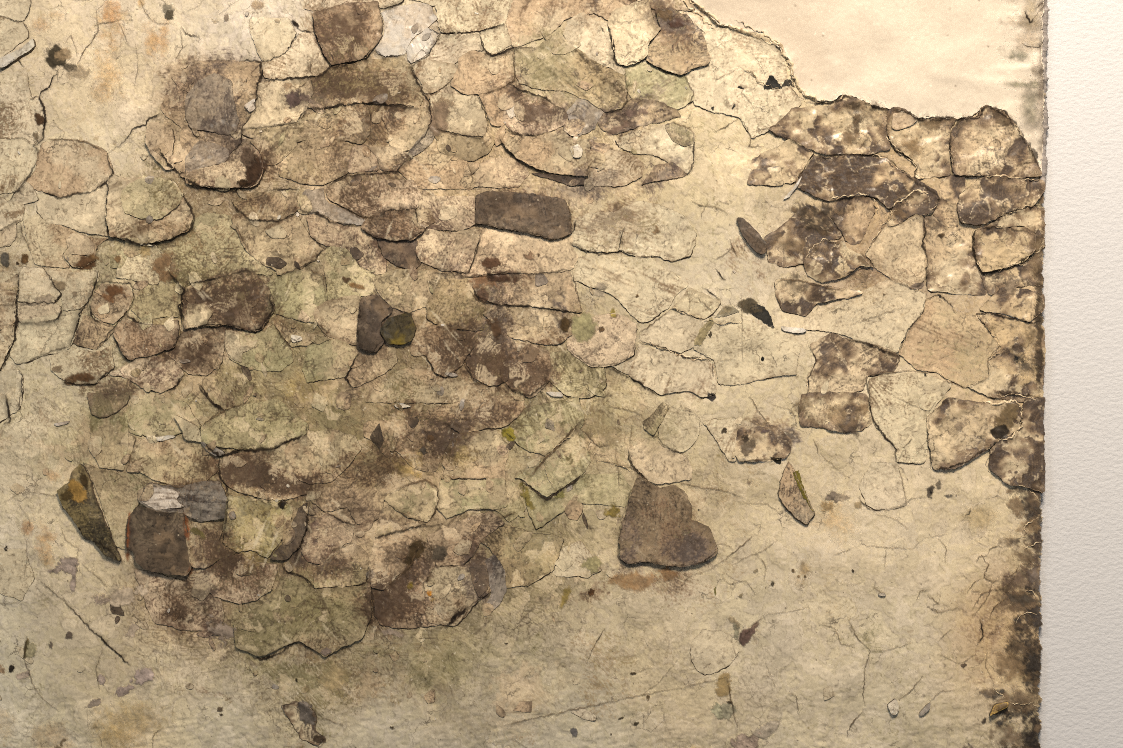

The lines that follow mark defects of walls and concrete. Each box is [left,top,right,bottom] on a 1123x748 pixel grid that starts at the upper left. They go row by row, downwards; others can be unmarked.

peeling [0,0,36,68]
crack [0,21,425,351]
crack [236,0,562,184]
crack [601,27,1039,198]
water stain [843,102,877,146]
water stain [992,110,1012,126]
crack [2,273,143,423]
peeling [57,24,1046,657]
water stain [1014,189,1045,383]
peeling [48,557,79,591]
water stain [979,470,1043,748]
peeling [281,686,326,746]